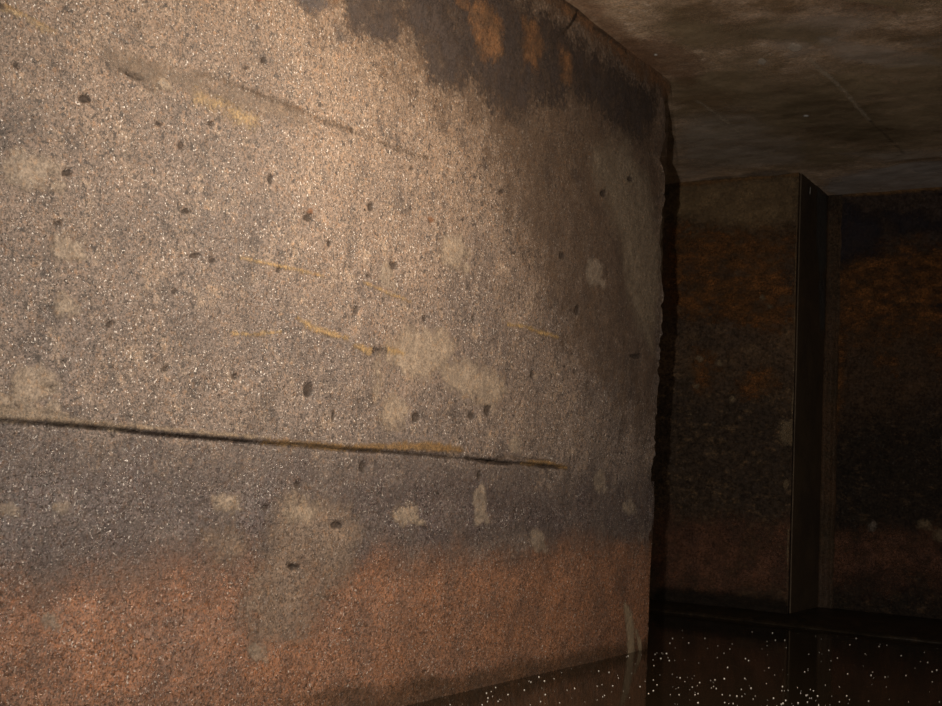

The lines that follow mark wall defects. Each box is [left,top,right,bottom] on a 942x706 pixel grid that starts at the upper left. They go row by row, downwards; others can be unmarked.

water stain [347,0,942,413]
crack [0,405,567,469]
rust [0,541,652,706]